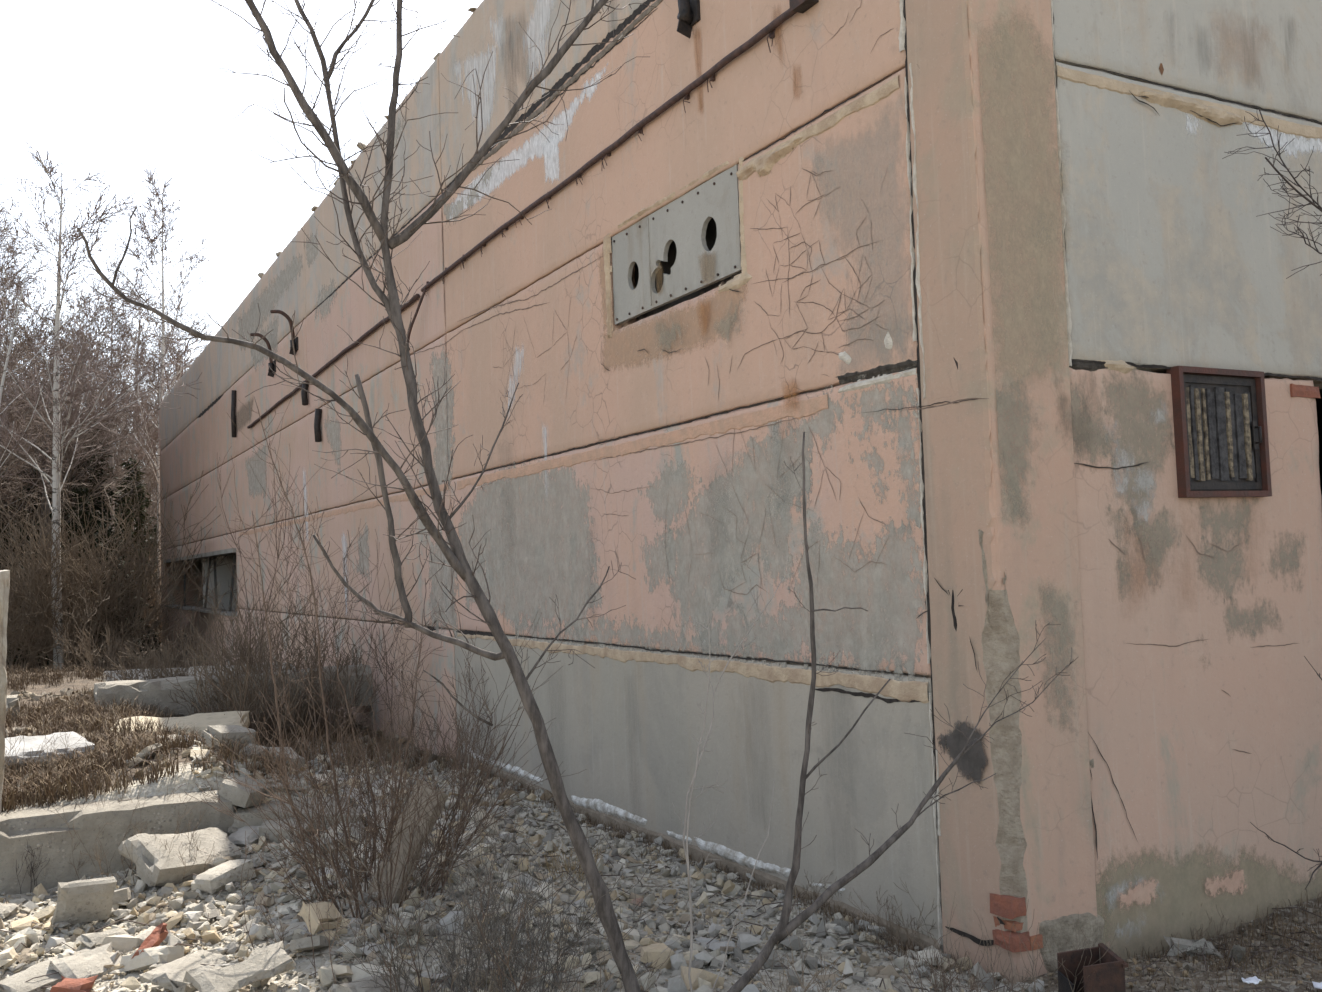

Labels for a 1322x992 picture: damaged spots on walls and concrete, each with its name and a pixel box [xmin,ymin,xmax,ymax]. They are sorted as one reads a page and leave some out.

peeling [430,346,455,486]
crack [310,0,1005,953]
peeling [429,378,925,681]
flaking render [1290,383,1321,398]